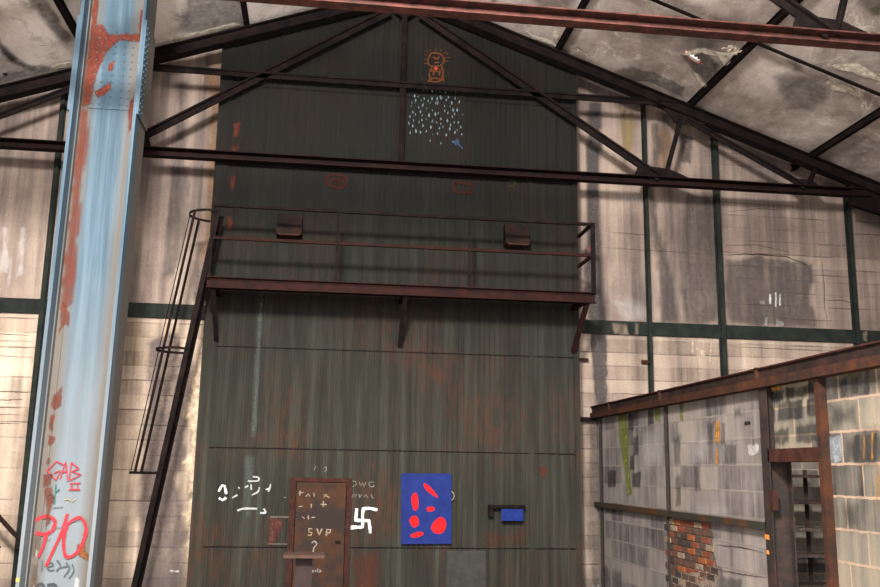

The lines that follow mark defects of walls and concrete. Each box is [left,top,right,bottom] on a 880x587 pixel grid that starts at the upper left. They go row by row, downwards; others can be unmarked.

damp [1,46,35,70]
corrosion [59,0,143,332]
damp [652,203,675,322]
damp [685,195,716,322]
damp [727,257,814,326]
corrosion [49,387,62,445]
corrosion [44,474,54,525]
flaking render [664,518,719,587]